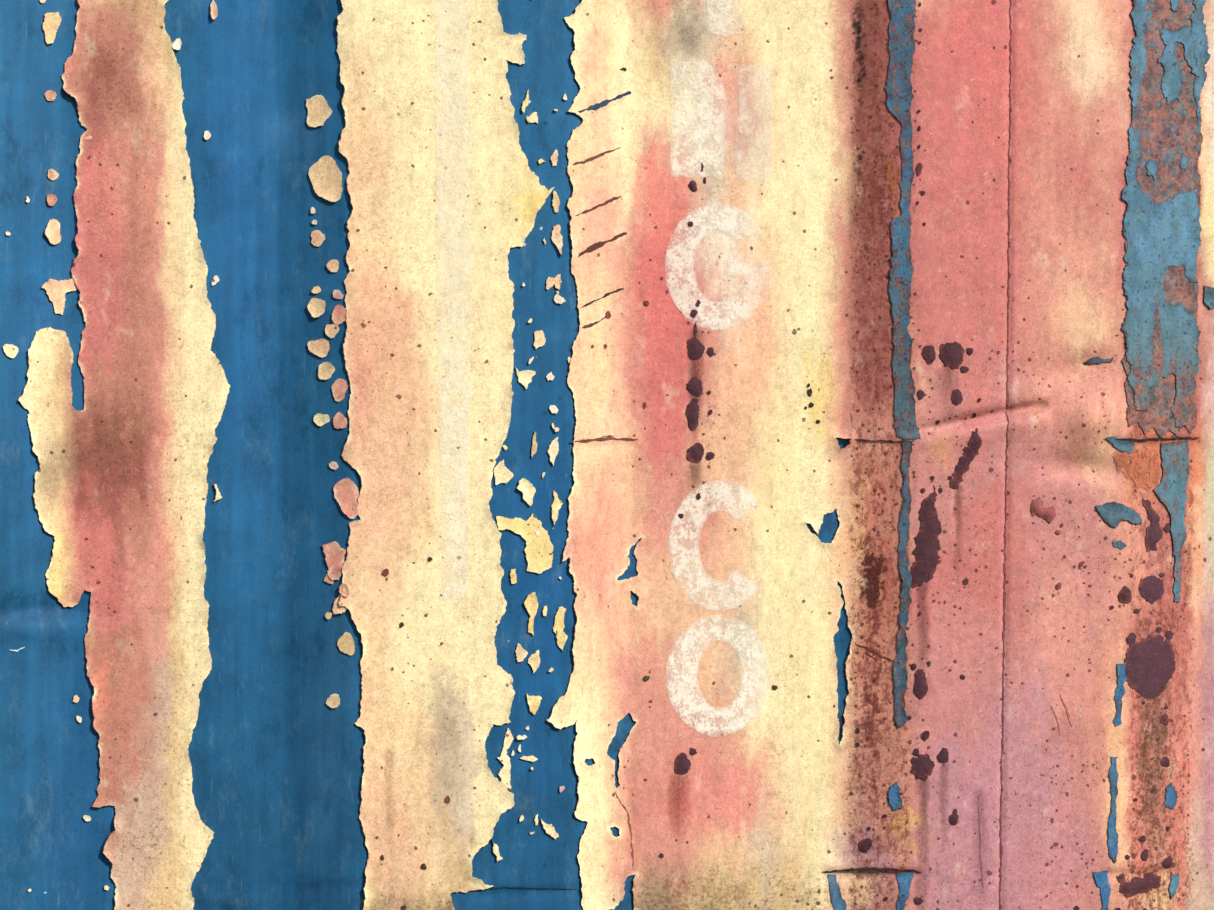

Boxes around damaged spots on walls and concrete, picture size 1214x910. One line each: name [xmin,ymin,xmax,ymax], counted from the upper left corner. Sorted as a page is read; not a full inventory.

rust [853,4,899,260]
peeling [2,0,230,910]
rust [686,300,715,478]
peeling [306,0,1214,910]
rust [910,398,982,638]
rust [922,342,974,405]
rust [1113,447,1170,552]
rust [675,748,697,816]
rust [859,827,872,852]
rust [856,494,887,818]
rust [912,661,931,699]
rust [1110,573,1176,910]